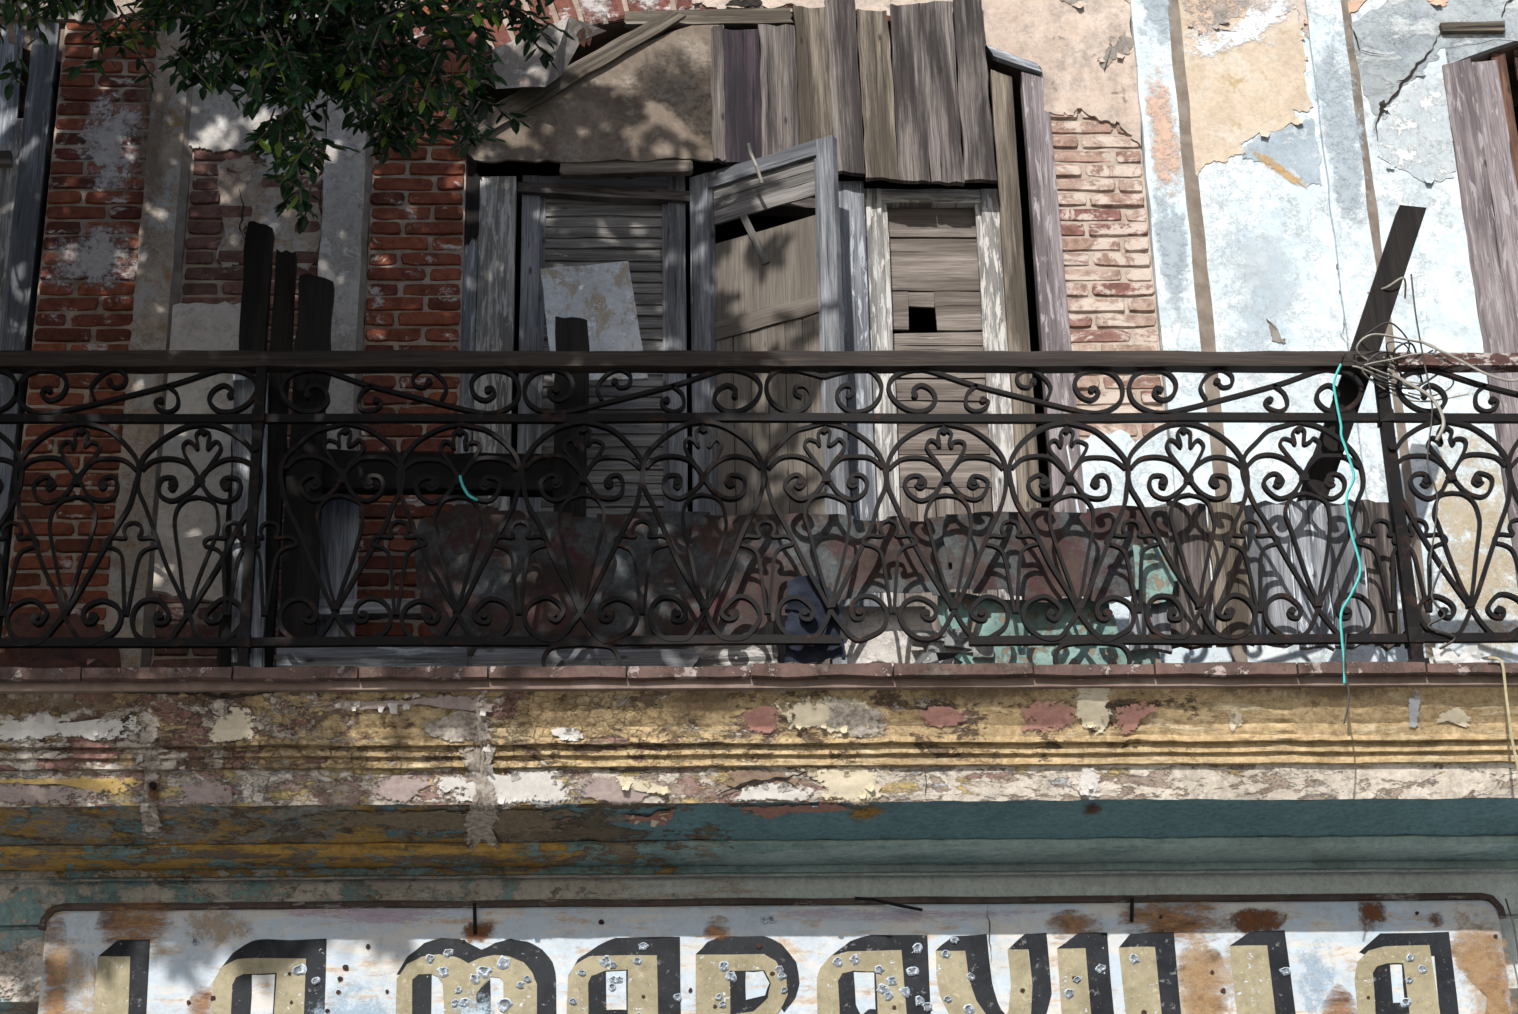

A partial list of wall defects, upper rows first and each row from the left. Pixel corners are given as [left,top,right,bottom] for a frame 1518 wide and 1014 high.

leakage [632,48,712,140]
crack [1349,23,1441,140]
spalling [32,3,158,351]
peeling [1050,0,1518,351]
spalling [1074,373,1168,442]
peeling [0,707,166,848]
spalling [322,690,677,854]
peeling [725,765,899,819]
rust [1121,902,1287,1014]
rust [1323,987,1355,1014]
rust [1359,895,1385,931]
rust [1430,913,1513,1014]